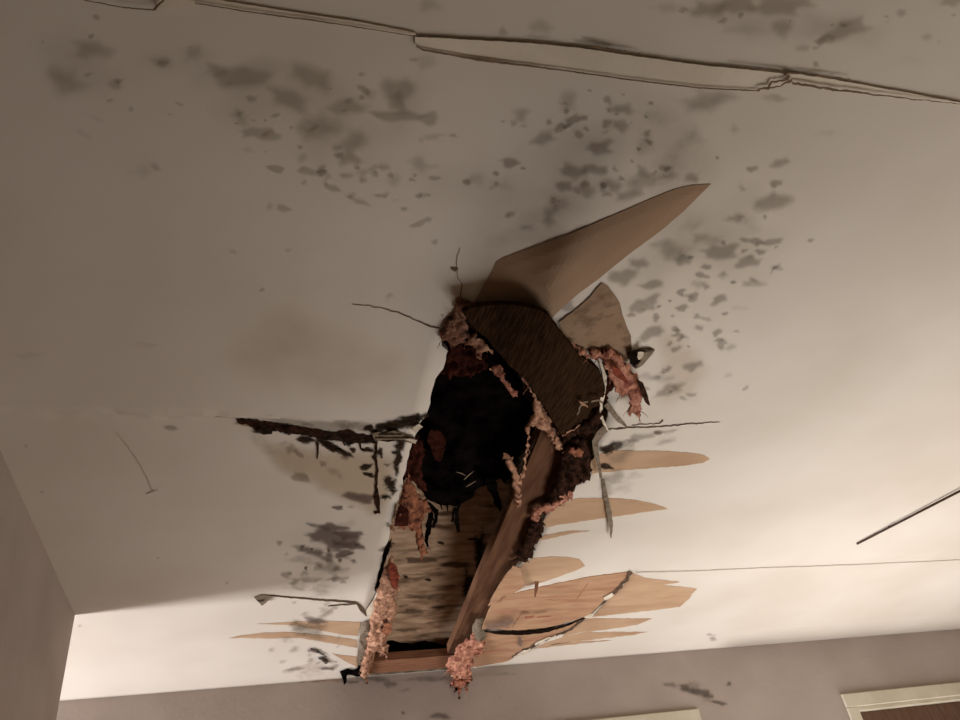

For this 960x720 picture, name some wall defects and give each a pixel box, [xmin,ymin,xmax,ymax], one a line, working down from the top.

crack [84,0,164,11]
crack [195,3,957,104]
peeling [474,184,710,318]
leakage [300,523,364,562]